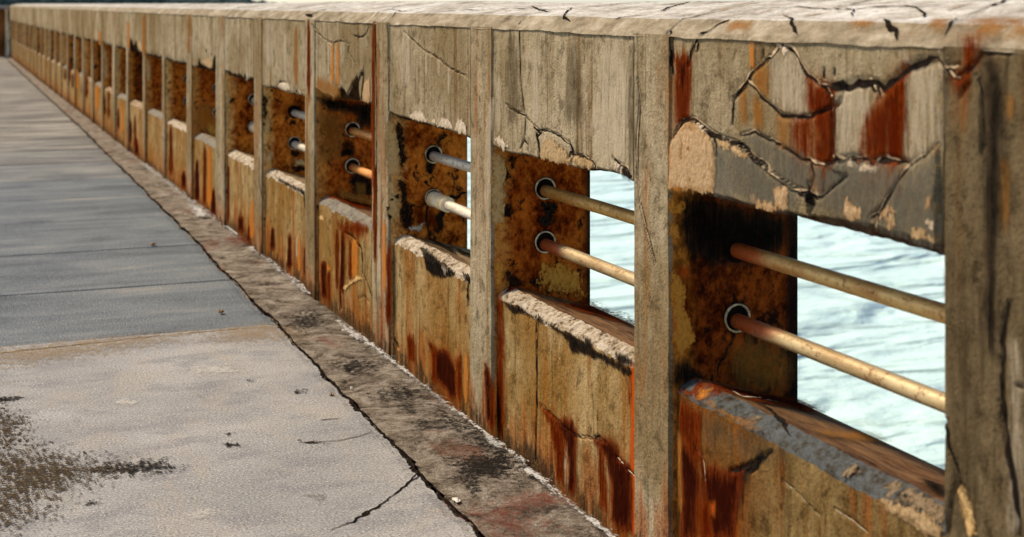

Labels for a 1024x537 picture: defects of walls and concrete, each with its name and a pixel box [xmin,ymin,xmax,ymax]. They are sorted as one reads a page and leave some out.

rust [320,24,392,326]
rust [673,52,692,139]
crack [451,0,1012,262]
spalling [668,121,941,245]
rust [778,73,836,186]
rust [858,63,909,183]
crack [1,59,485,537]
peeling [669,267,698,356]
rust [428,343,468,410]
rust [539,404,578,502]
rust [593,365,635,537]
rust [676,377,823,537]